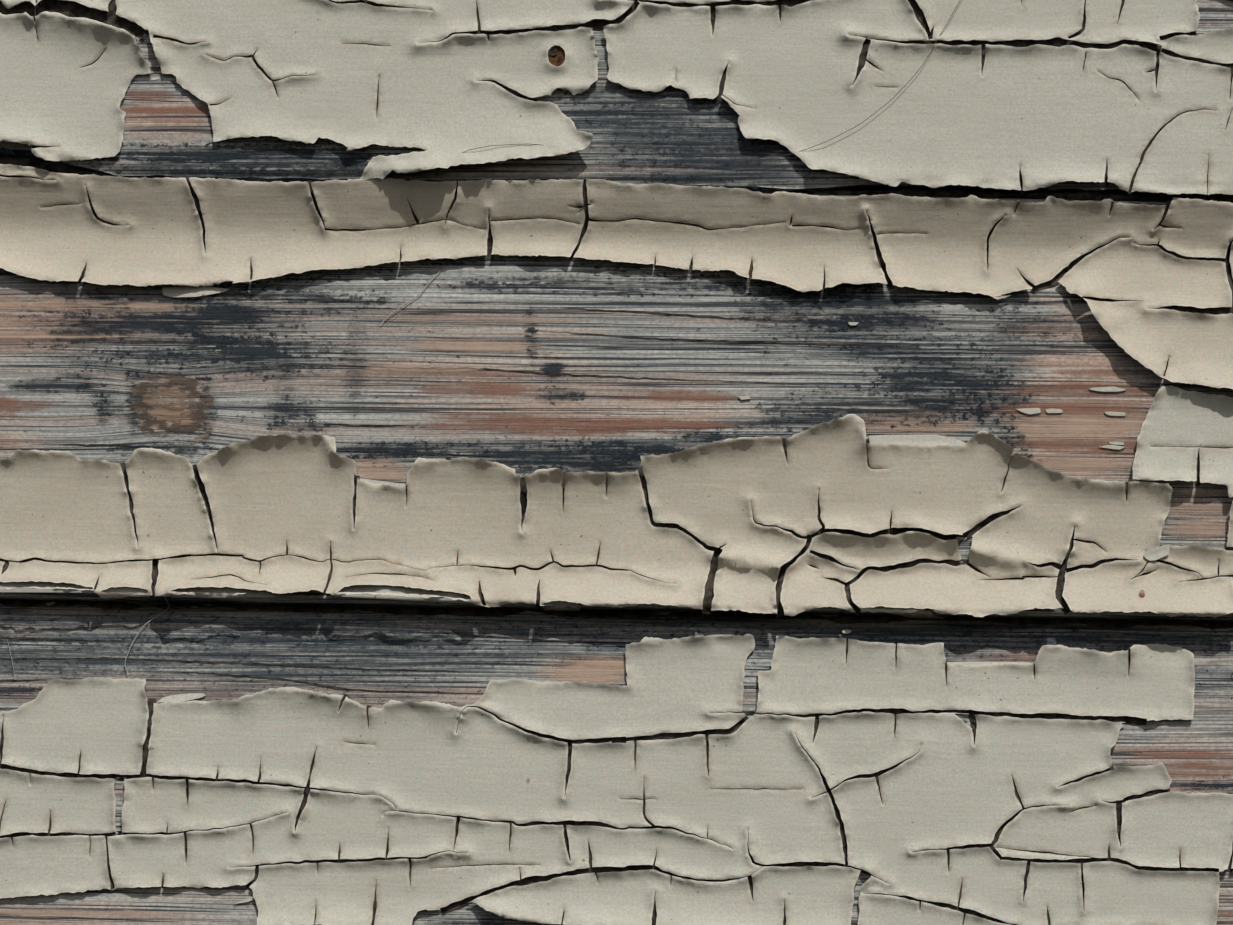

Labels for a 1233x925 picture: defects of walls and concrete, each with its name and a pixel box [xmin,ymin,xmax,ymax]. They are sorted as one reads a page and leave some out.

crack [0,0,310,99]
crack [184,176,206,251]
crack [482,80,537,101]
crack [307,179,911,290]
peeling [0,0,1233,619]
crack [437,0,811,83]
crack [853,0,1233,315]
crack [0,423,663,644]
crack [637,467,726,614]
crack [751,455,1233,662]
peeling [0,629,1233,925]
crack [0,636,1233,925]